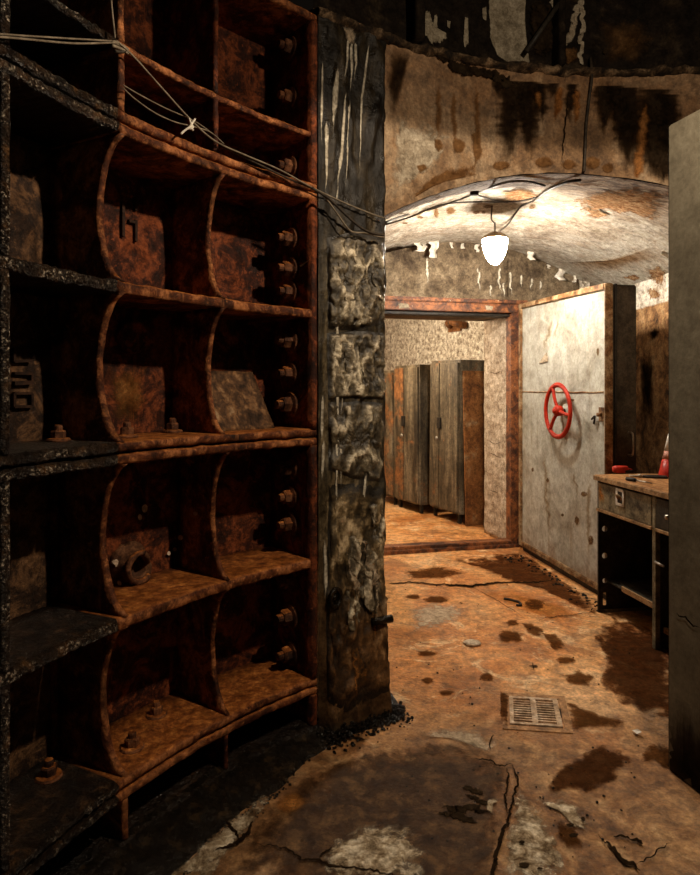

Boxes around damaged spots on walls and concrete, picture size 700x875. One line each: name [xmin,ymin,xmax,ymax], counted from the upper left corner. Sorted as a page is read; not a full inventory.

flaking render [425,11,451,44]
flaking render [482,0,530,62]
flaking render [566,0,586,64]
leakage [321,29,369,189]
leakage [596,86,678,173]
leakage [409,568,458,578]
crack [390,580,551,611]
leakage [464,554,594,608]
leakage [567,617,669,716]
leakage [550,747,629,791]
crack [475,735,519,875]
crack [598,834,667,871]